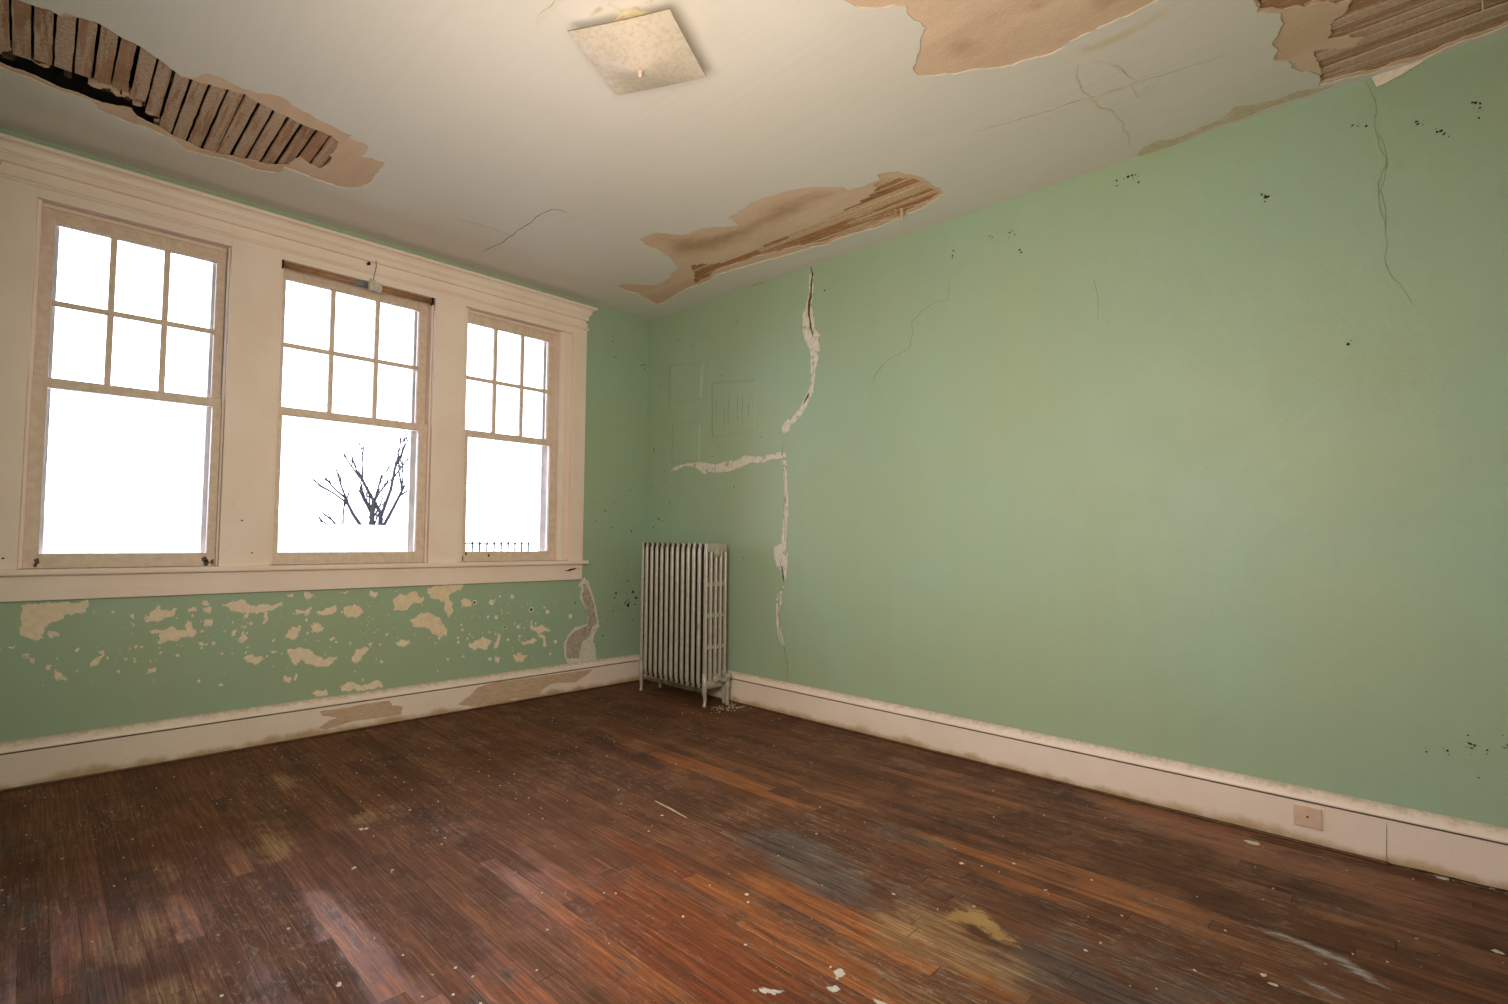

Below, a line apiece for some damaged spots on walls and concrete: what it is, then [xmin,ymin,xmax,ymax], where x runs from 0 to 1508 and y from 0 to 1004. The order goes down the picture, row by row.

flaking render [0,0,338,168]
flaking render [1138,0,1508,155]
flaking render [691,178,939,282]
crack [774,268,821,679]
peeling [0,568,600,730]